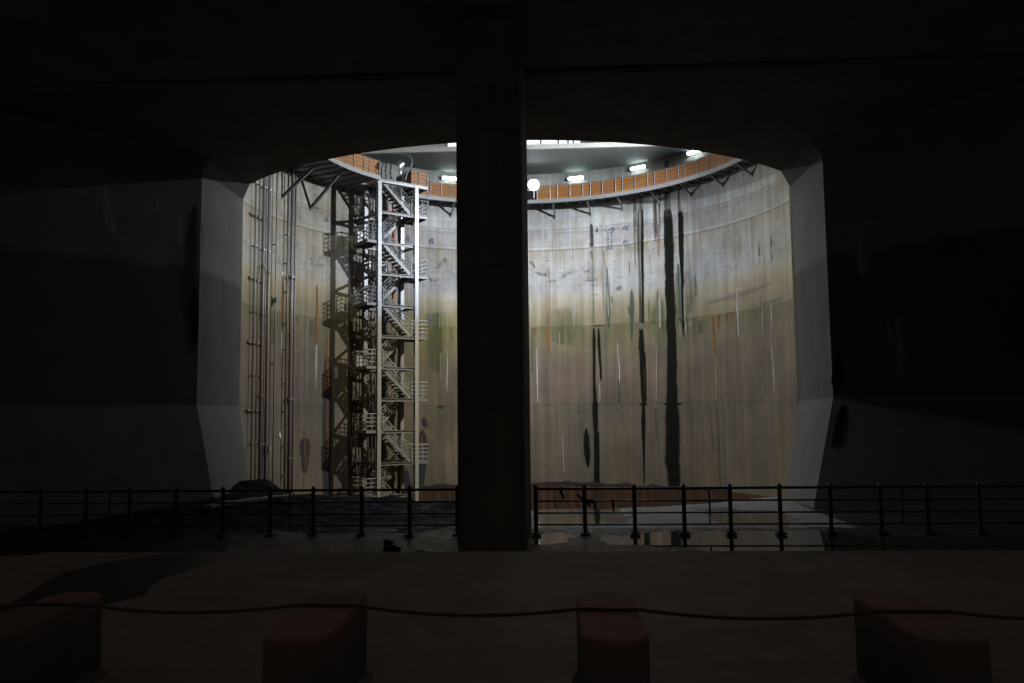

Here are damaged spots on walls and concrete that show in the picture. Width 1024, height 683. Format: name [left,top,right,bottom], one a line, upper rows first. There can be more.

water stain [300,434,310,473]
water stain [531,190,728,492]